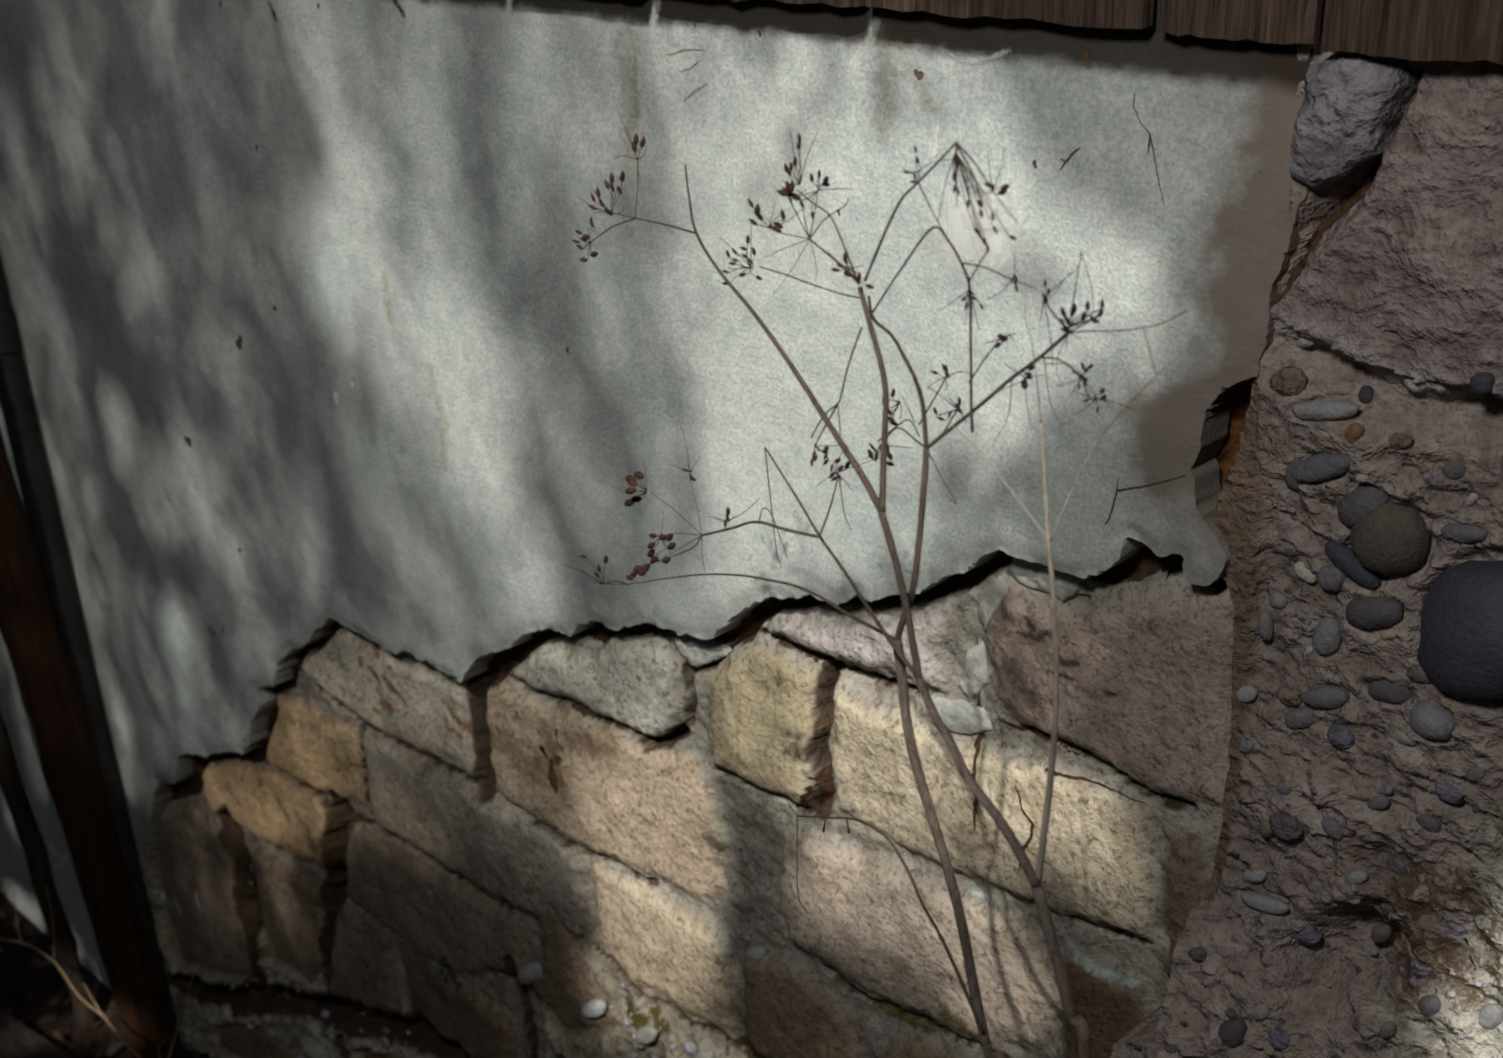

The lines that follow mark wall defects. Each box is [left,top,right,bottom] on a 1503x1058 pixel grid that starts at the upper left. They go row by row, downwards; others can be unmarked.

flaking render [675,637,732,668]
flaking render [931,557,1081,735]